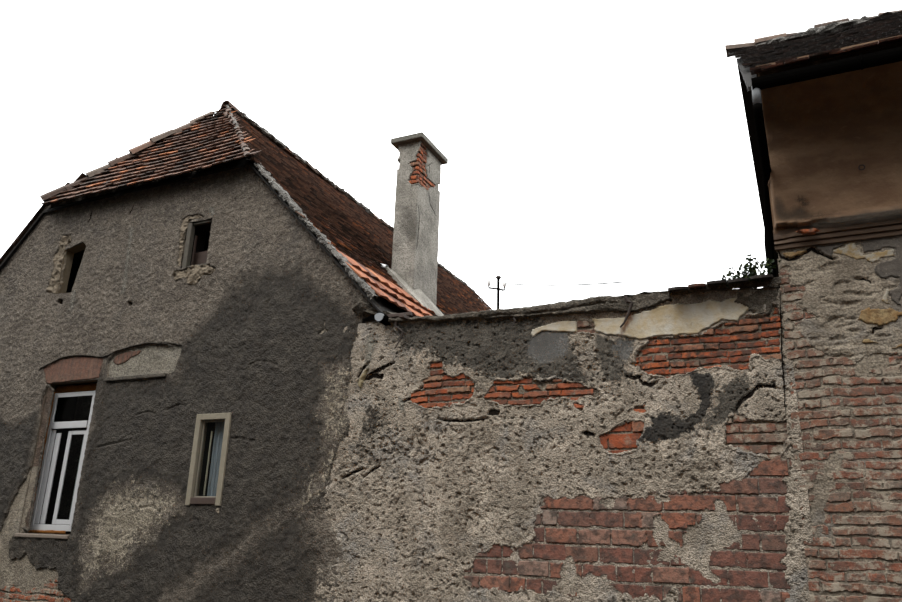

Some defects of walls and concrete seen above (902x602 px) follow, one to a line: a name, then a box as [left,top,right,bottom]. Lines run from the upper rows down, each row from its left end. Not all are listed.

flaking render [408,143,436,191]
flaking render [46,235,71,294]
flaking render [173,214,215,286]
flaking render [409,359,603,411]
flaking render [464,228,902,602]
flaking render [0,384,193,602]